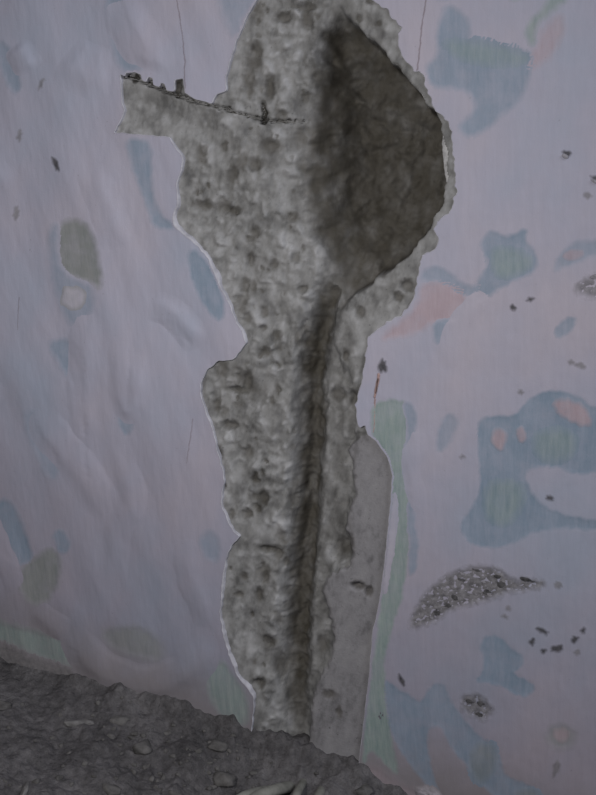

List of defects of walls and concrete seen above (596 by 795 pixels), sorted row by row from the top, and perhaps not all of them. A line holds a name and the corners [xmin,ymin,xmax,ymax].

flaking render [114,0,570,795]
peeling [527,625,587,657]